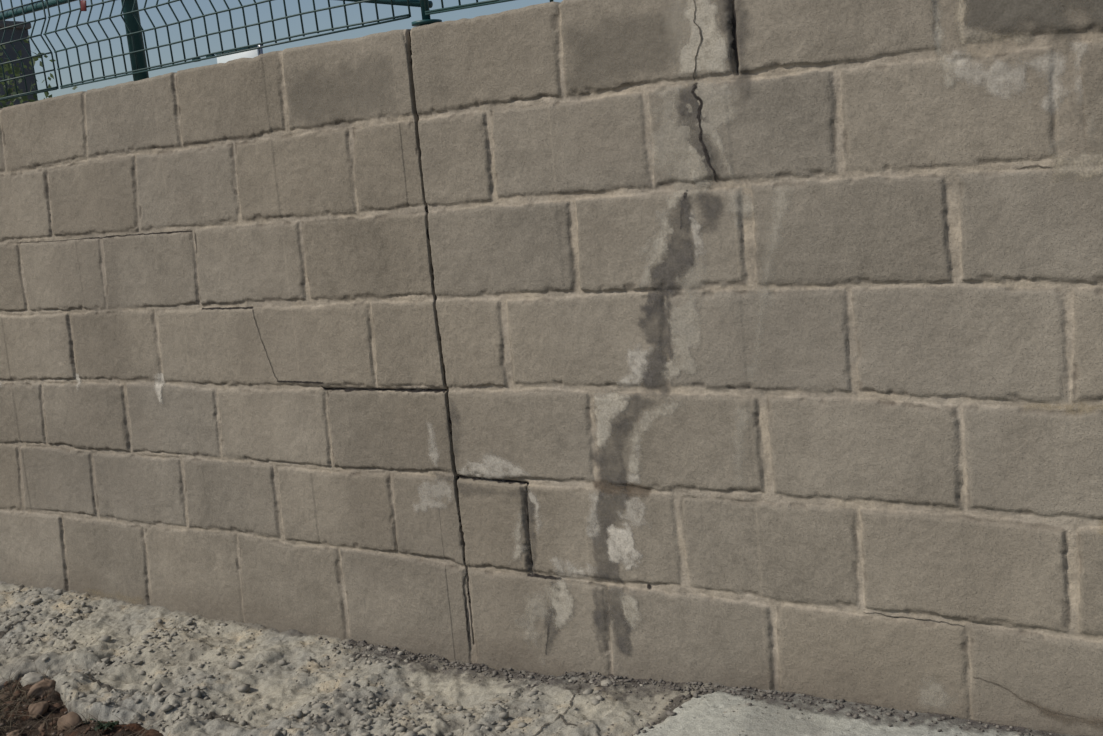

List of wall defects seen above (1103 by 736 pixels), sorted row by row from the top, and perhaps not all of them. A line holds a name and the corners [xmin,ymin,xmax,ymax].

crack [731,3,739,75]
damp [964,0,1069,33]
damp [679,86,712,167]
crack [691,0,717,181]
damp [941,52,1063,109]
crack [19,205,529,642]
damp [587,194,721,655]
crack [527,513,561,654]
crack [974,677,1103,724]